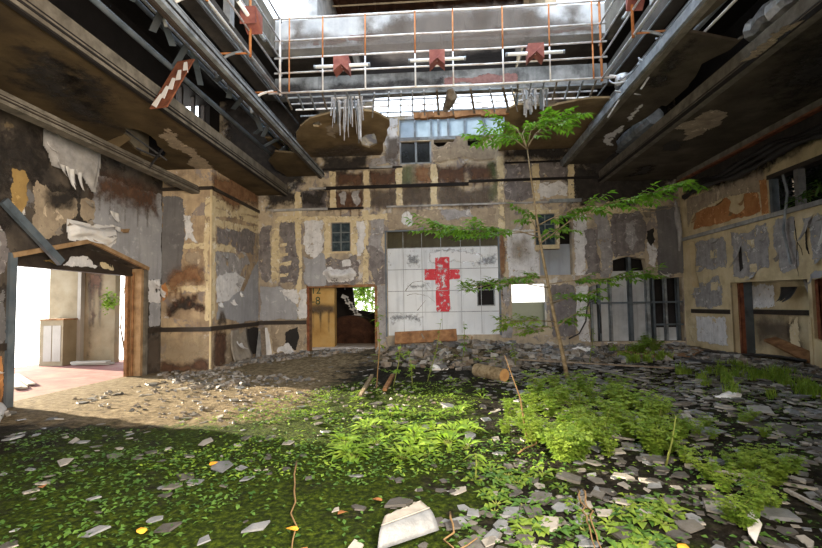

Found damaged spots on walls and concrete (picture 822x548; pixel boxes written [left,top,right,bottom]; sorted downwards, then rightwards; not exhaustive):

peeling [47,142,85,191]
flaking render [10,168,29,215]
peeling [84,220,130,245]
peeling [43,256,114,271]